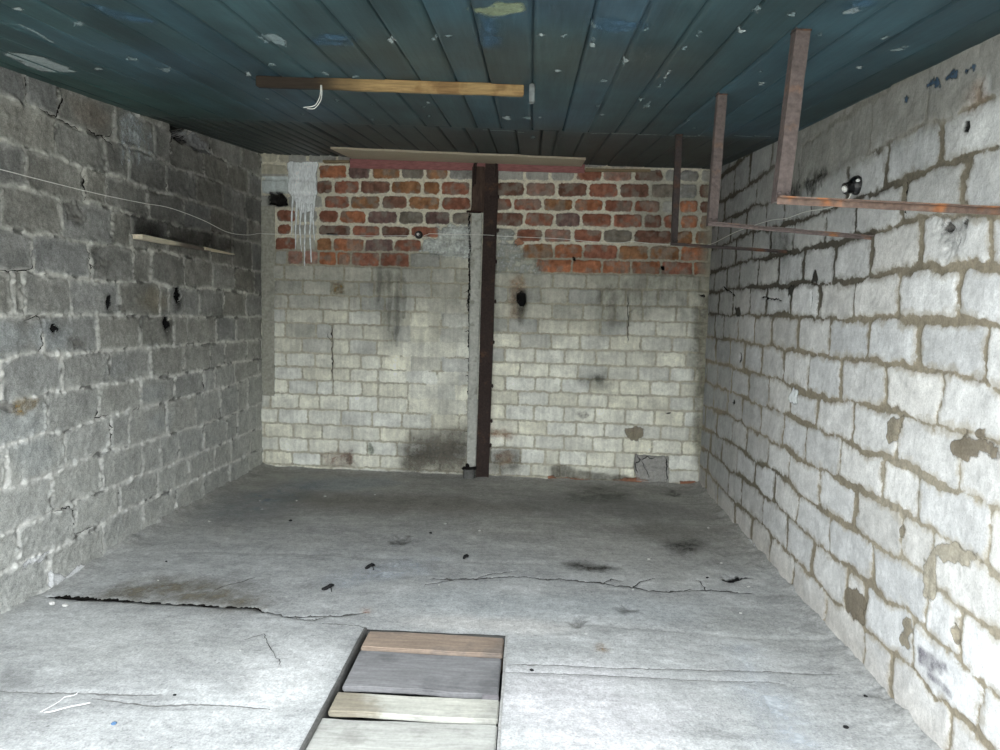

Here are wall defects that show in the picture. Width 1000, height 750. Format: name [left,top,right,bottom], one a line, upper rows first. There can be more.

peeling [474,2,524,16]
damp [287,161,318,266]
damp [403,431,466,472]
crack [425,571,752,594]
crack [48,577,366,666]